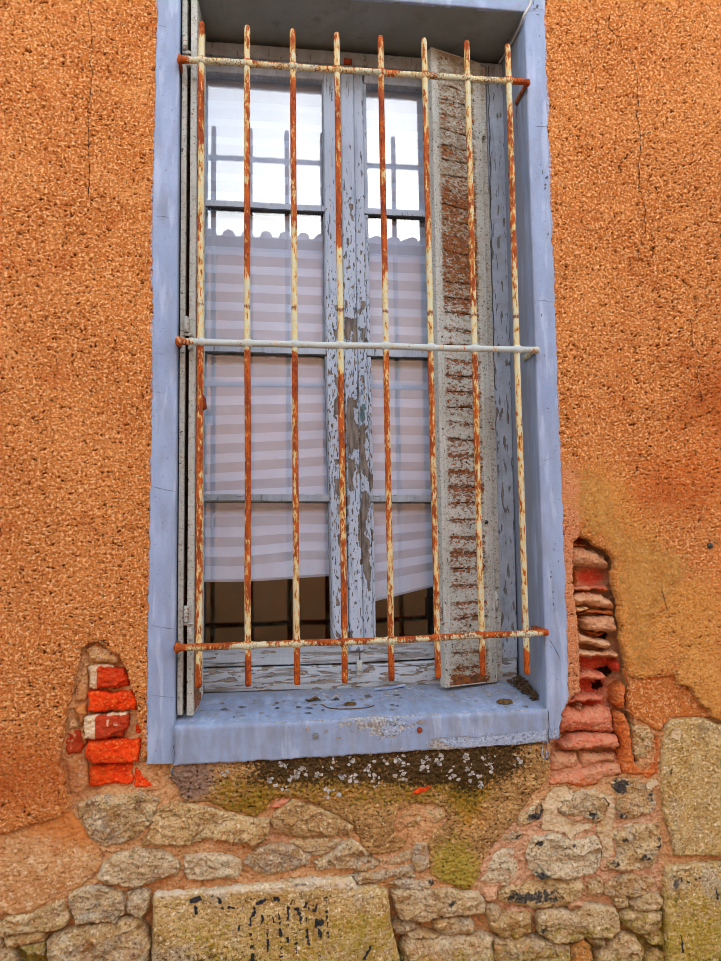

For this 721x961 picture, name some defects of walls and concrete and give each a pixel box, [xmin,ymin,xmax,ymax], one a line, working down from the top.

spalling [66,642,152,796]
peeling [296,684,406,714]
spalling [437,537,659,787]